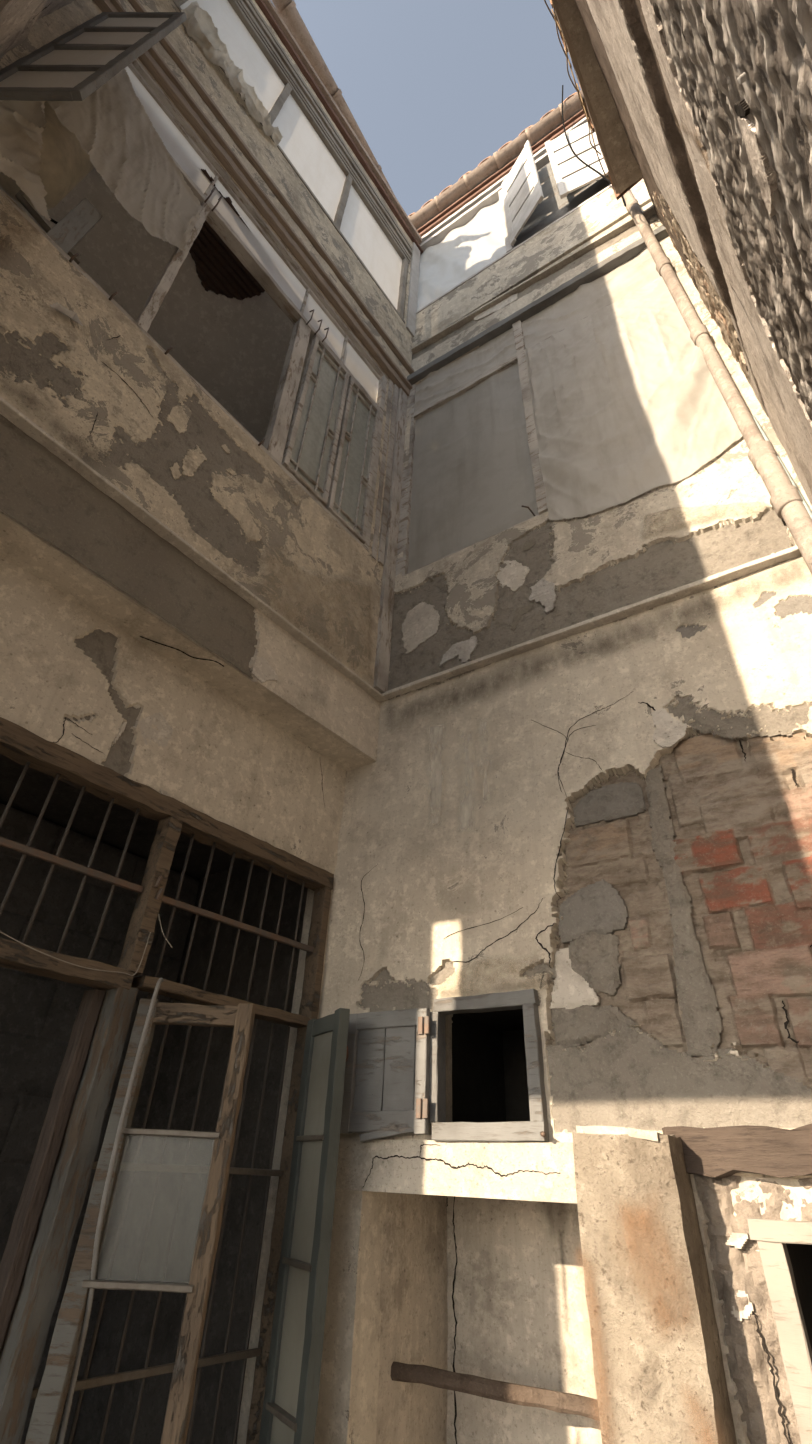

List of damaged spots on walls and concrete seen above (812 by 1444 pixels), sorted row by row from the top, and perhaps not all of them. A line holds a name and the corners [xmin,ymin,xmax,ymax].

spalling [189,220,265,301]
spalling [74,629,173,776]
spalling [0,414,279,683]
crack [140,636,224,667]
peeling [104,347,298,575]
spalling [388,510,795,700]
peeling [754,592,812,619]
crack [441,695,655,984]
spalling [522,696,812,1092]
crack [363,1144,561,1444]
peeling [725,1233,749,1249]
peeling [731,1290,754,1321]